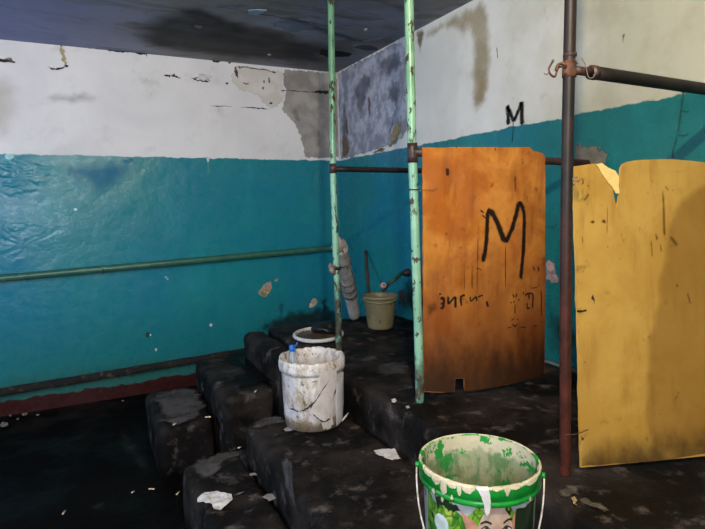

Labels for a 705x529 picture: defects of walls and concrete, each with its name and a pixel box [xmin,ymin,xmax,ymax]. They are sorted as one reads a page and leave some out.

crack [50,45,68,70]
crack [164,60,274,85]
leakage [144,11,323,60]
leakage [469,10,487,98]
flaking render [226,66,339,159]
leakage [339,36,407,159]
spalling [259,278,278,297]